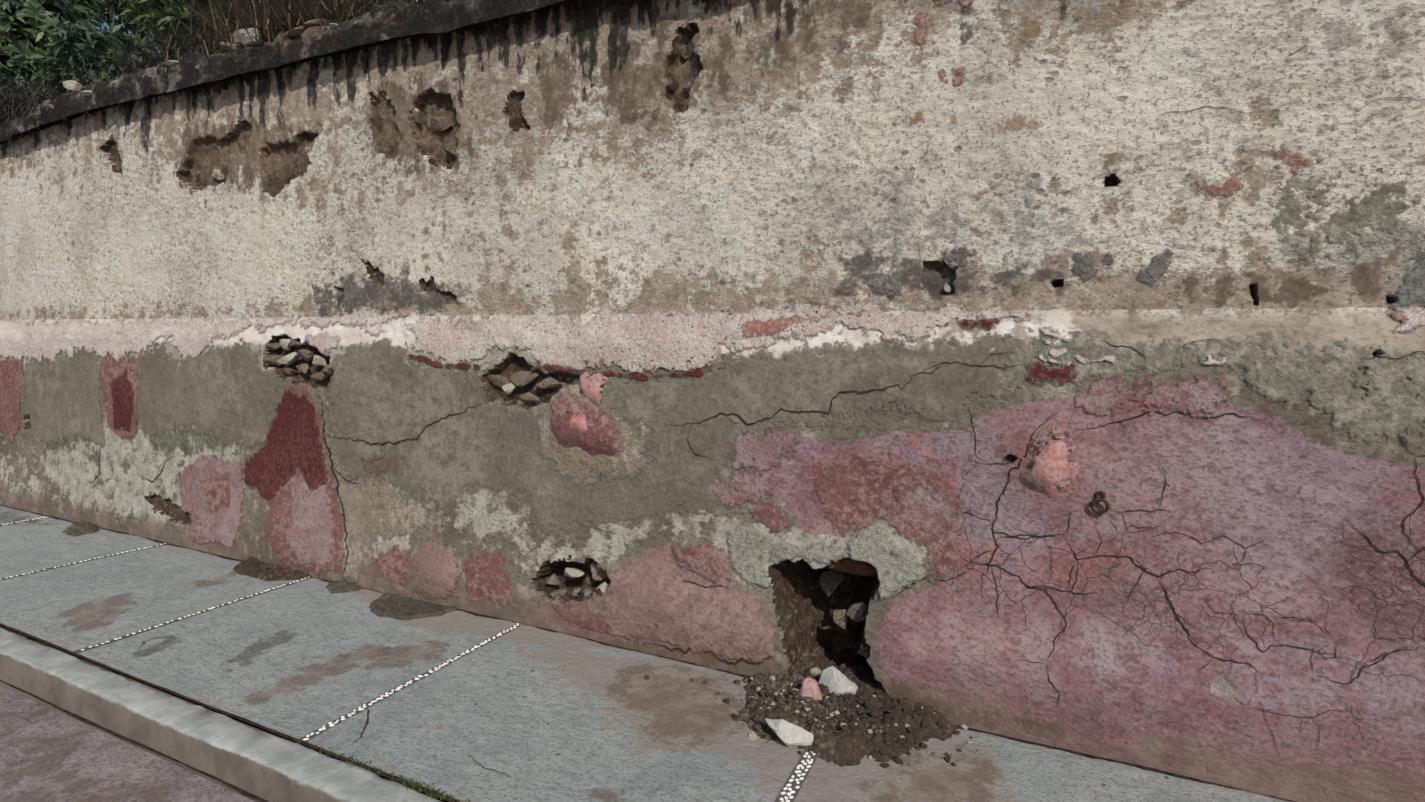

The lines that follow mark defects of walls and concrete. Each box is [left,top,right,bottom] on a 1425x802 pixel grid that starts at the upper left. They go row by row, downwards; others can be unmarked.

spalling [99,133,123,176]
spalling [176,119,319,198]
spalling [368,87,461,169]
leakage [0,0,882,195]
spalling [663,22,704,113]
leakage [312,270,460,317]
leakage [836,250,1065,300]
flaking render [0,142,1425,692]
crack [669,351,1024,458]
crack [894,408,1425,756]